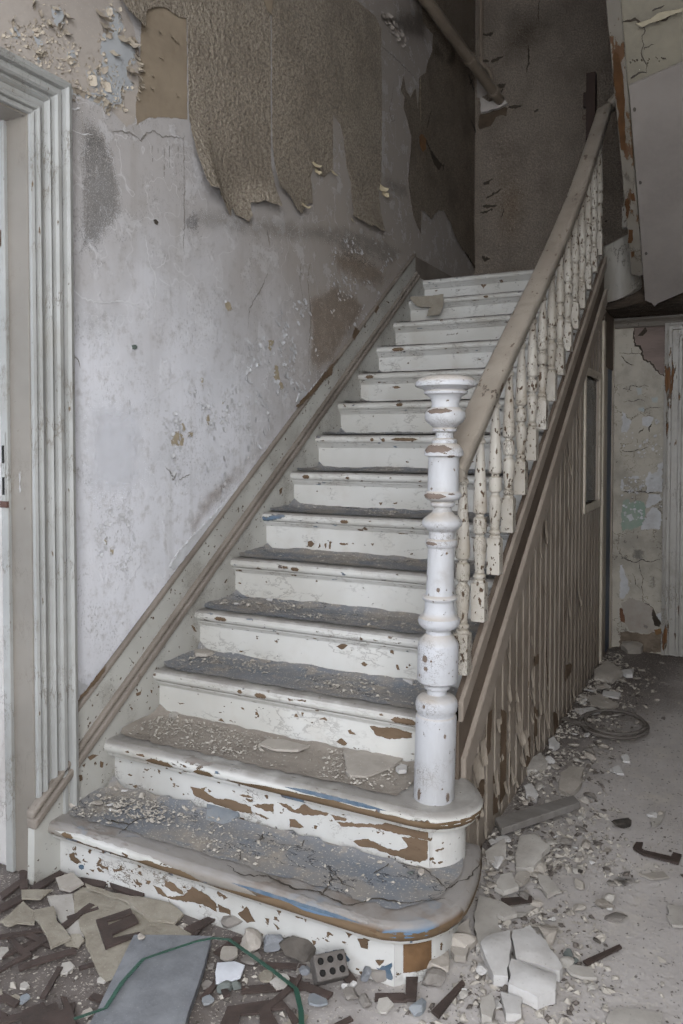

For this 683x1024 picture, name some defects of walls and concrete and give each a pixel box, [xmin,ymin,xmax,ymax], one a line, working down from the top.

peeling [0,0,154,128]
peeling [613,52,626,150]
crack [72,129,185,249]
crack [621,348,660,458]
peeling [620,411,663,530]
peeling [619,565,629,623]
crack [624,558,660,609]
spalling [652,609,661,627]
peeling [191,787,428,863]
peeling [139,880,280,930]
crack [228,826,480,906]